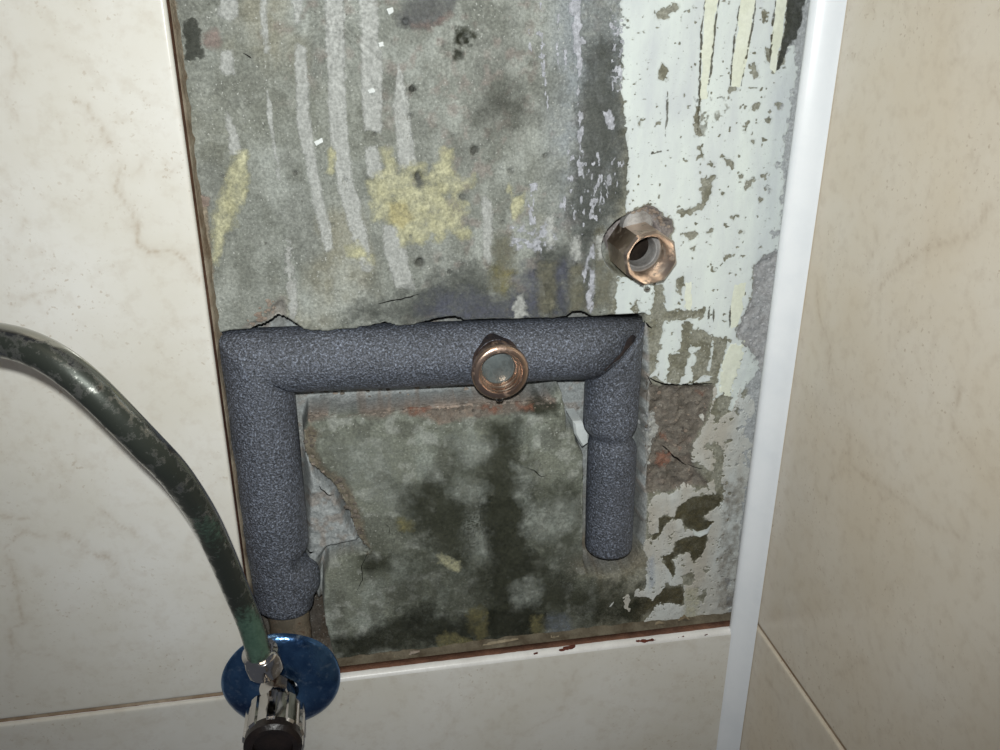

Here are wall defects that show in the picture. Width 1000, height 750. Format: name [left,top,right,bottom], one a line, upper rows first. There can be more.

spalling [366,386,554,422]
leakage [333,425,640,657]
crack [662,445,703,469]
peeling [609,0,807,622]